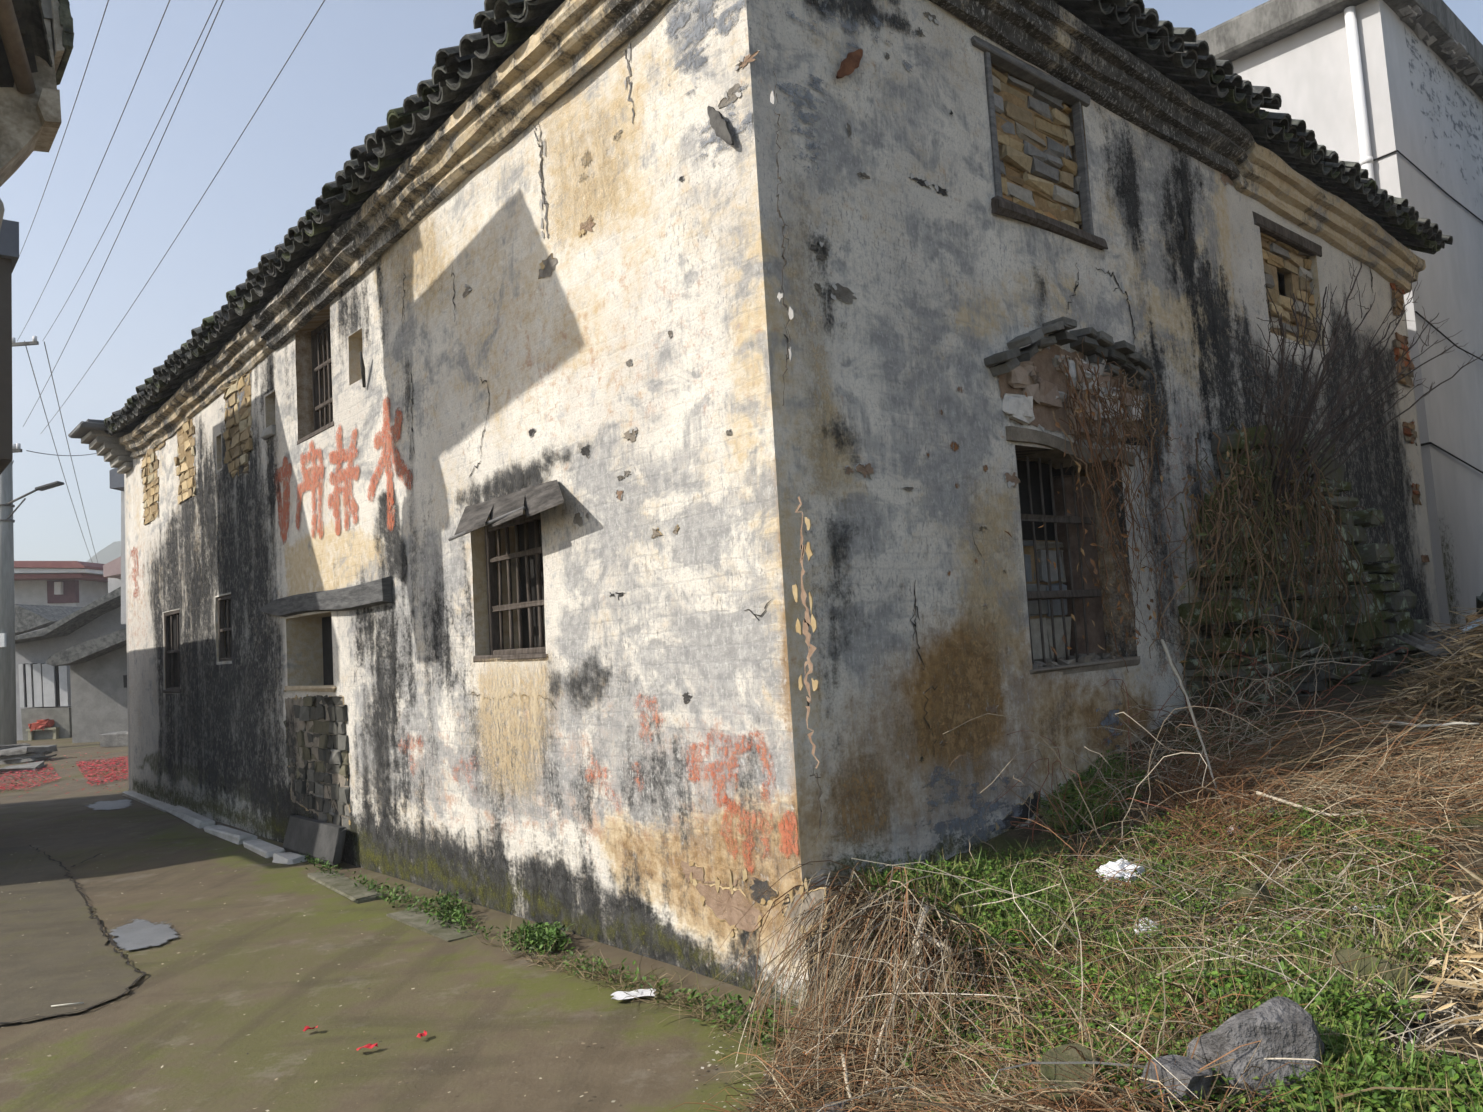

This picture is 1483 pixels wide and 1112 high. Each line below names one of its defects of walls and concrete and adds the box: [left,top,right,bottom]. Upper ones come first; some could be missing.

crack [624,42,634,124]
crack [533,122,549,238]
spalling [538,253,558,279]
crack [770,71,795,406]
leakage [1108,138,1146,264]
crack [469,377,490,477]
leakage [803,235,854,486]
spalling [997,345,1145,449]
leakage [1140,307,1171,554]
leakage [1161,148,1433,633]
leakage [147,356,780,1001]